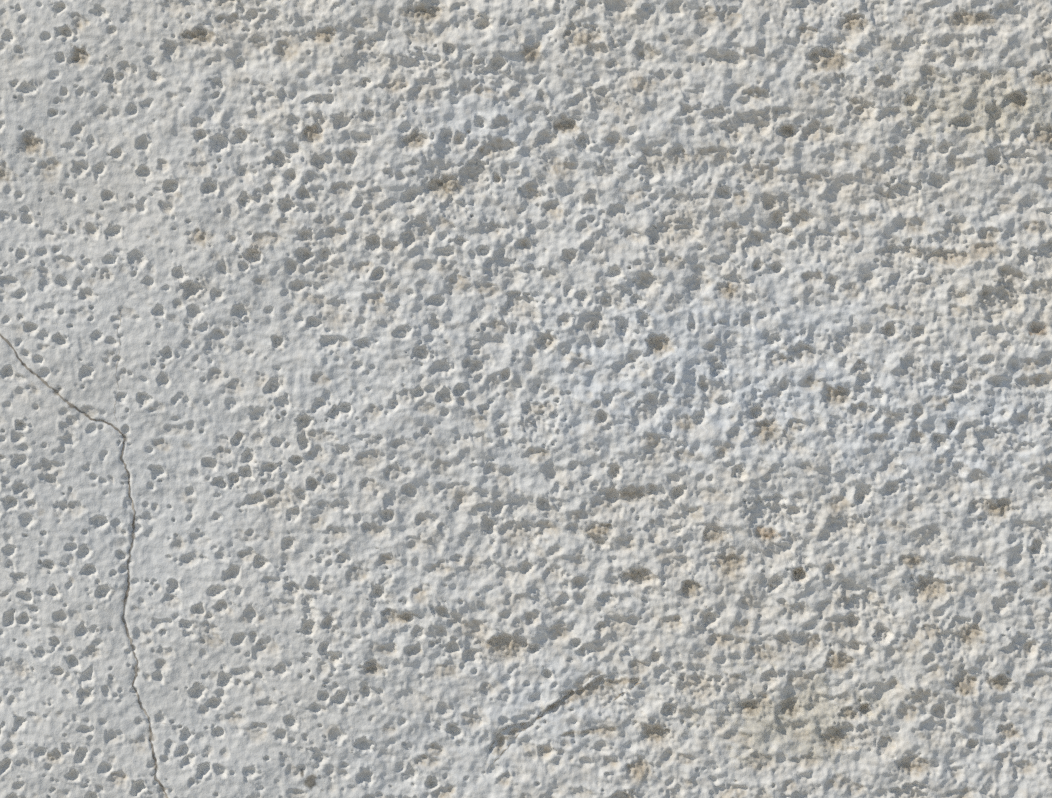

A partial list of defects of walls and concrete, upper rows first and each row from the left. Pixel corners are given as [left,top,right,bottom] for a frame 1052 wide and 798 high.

crack [0,306,169,798]